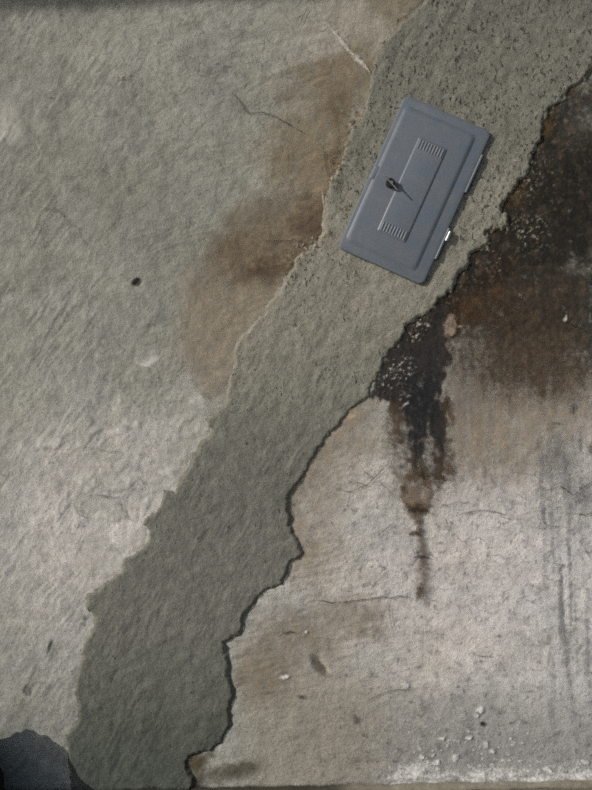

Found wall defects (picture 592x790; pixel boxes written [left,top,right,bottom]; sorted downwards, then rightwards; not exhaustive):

damp [188,48,373,387]
peeling [136,352,160,368]
peeling [443,314,462,337]
damp [370,82,592,599]
peeling [70,447,189,522]
peeling [74,551,123,583]
damp [558,576,576,637]